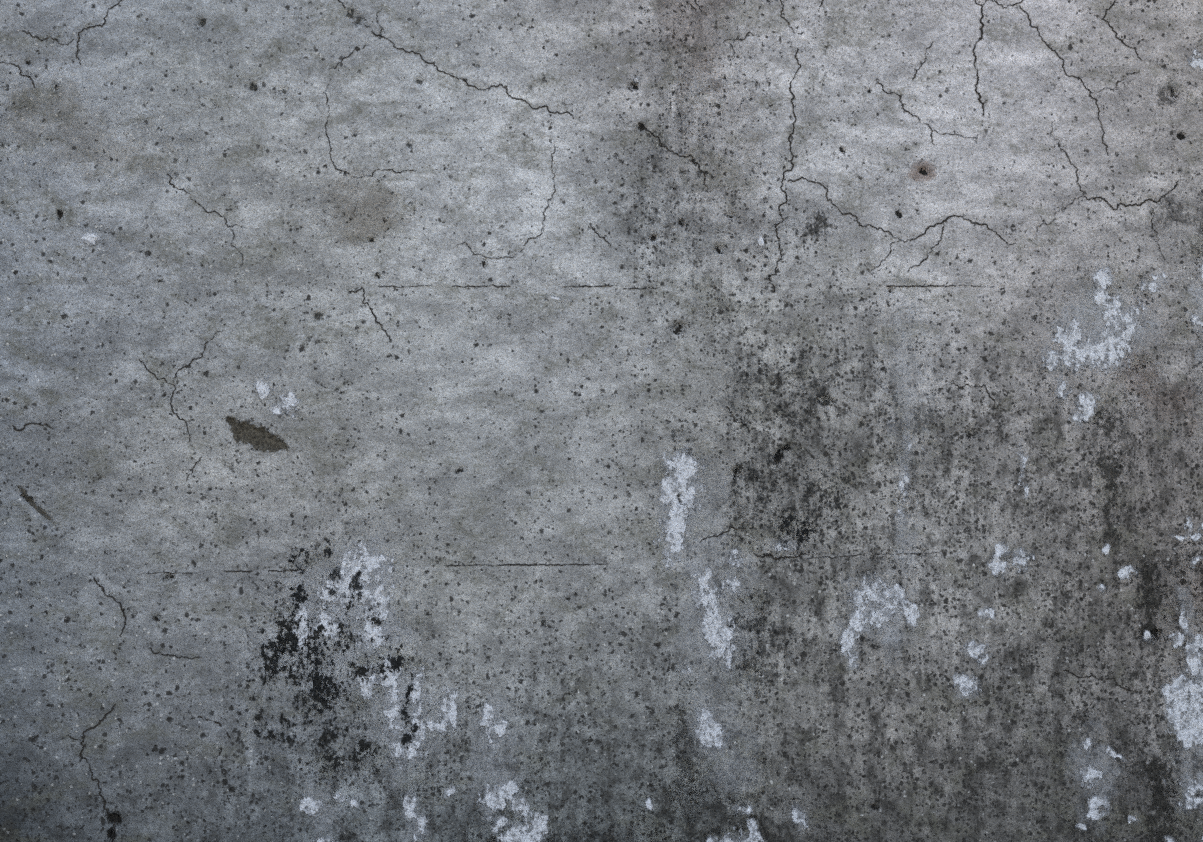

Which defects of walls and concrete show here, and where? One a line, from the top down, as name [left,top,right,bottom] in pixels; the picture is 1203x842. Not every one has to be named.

crack [21,0,122,65]
crack [325,0,574,217]
crack [768,0,1180,292]
crack [167,174,244,268]
crack [457,149,556,259]
spalling [222,376,301,452]
water stain [728,453,849,562]
water stain [1094,409,1123,539]
water stain [237,539,420,782]
water stain [724,592,794,686]
water stain [1135,561,1165,639]
water stain [1138,753,1181,842]